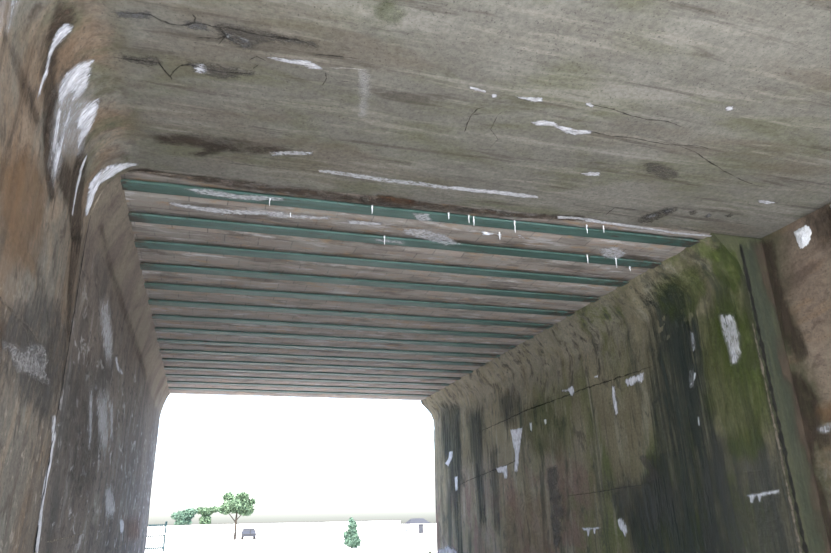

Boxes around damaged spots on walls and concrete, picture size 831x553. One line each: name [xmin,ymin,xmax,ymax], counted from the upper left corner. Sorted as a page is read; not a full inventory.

crack [113,12,362,84]
crack [564,105,767,189]
leakage [1,4,712,429]
leakage [36,417,56,552]
leakage [89,392,113,446]
leakage [105,488,115,518]
leakage [440,389,532,553]
crack [478,364,656,433]
leakage [602,282,800,553]
leakage [755,243,831,553]